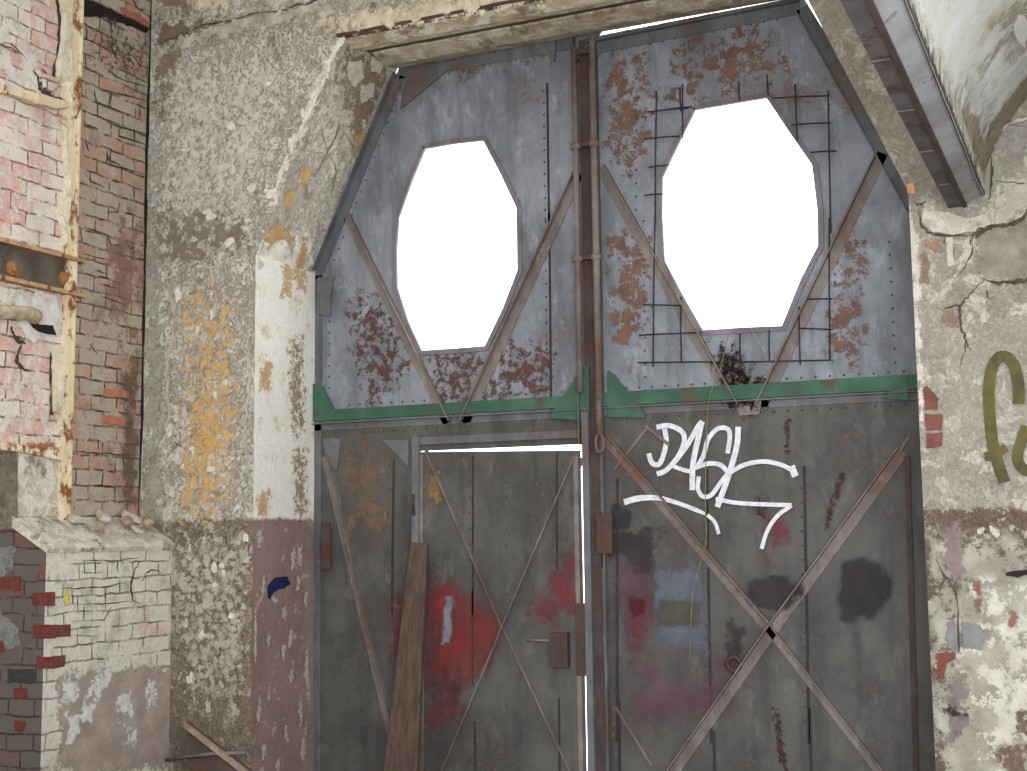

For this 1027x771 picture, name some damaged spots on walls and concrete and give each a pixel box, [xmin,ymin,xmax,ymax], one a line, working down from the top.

crack [0,42,27,60]
corrosion [599,22,790,179]
crack [988,156,1025,200]
peeling [0,0,546,771]
corrosion [345,290,411,406]
corrosion [423,338,557,403]
corrosion [825,239,868,369]
crack [914,201,990,366]
peeling [924,505,1027,771]